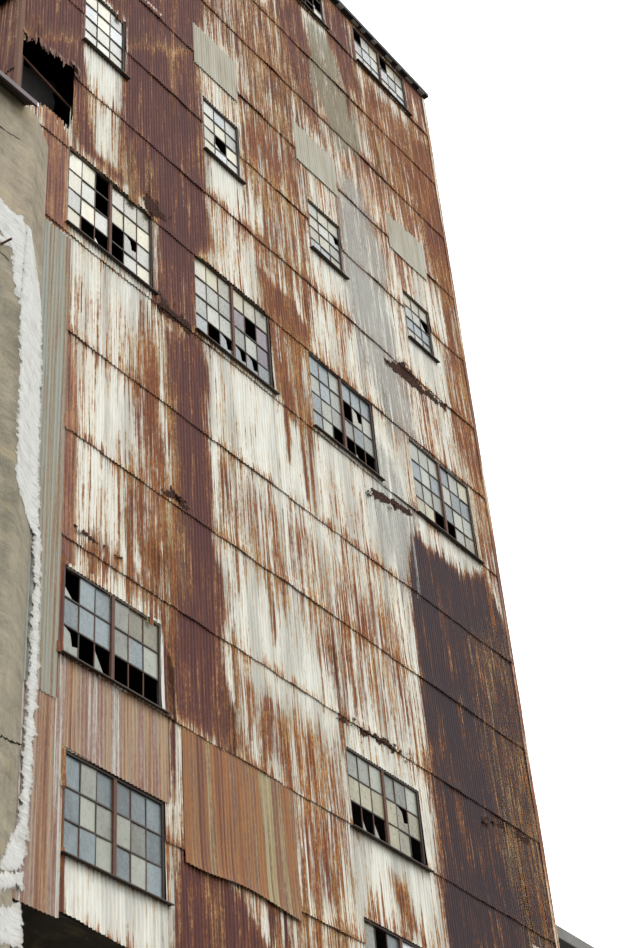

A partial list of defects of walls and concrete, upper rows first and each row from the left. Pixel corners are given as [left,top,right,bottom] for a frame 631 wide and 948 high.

peeling [28,32,81,77]
rust [23,0,428,948]
rust [323,0,556,948]